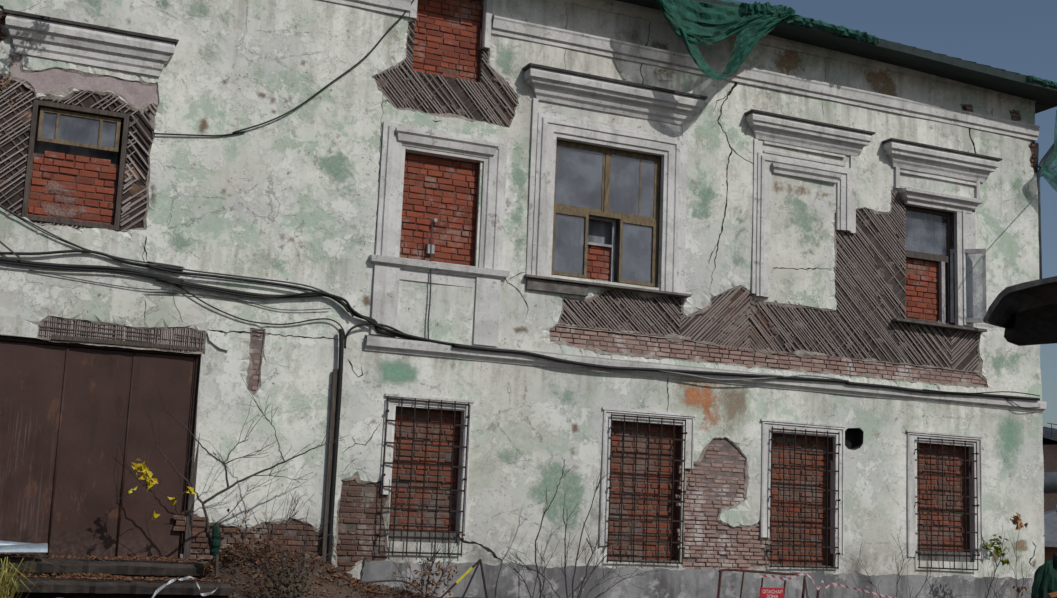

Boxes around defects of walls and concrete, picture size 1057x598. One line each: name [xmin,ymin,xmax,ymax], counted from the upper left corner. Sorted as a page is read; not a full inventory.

spalling [0,10,8,43]
flaking render [372,21,519,128]
flaking render [0,54,159,232]
crack [709,82,754,287]
flaking render [549,190,988,388]
flaking render [246,328,266,394]
water stain [380,362,416,382]
rust [685,381,717,429]
flaking render [173,471,396,573]
water stain [532,462,583,529]
flaking render [675,437,769,572]